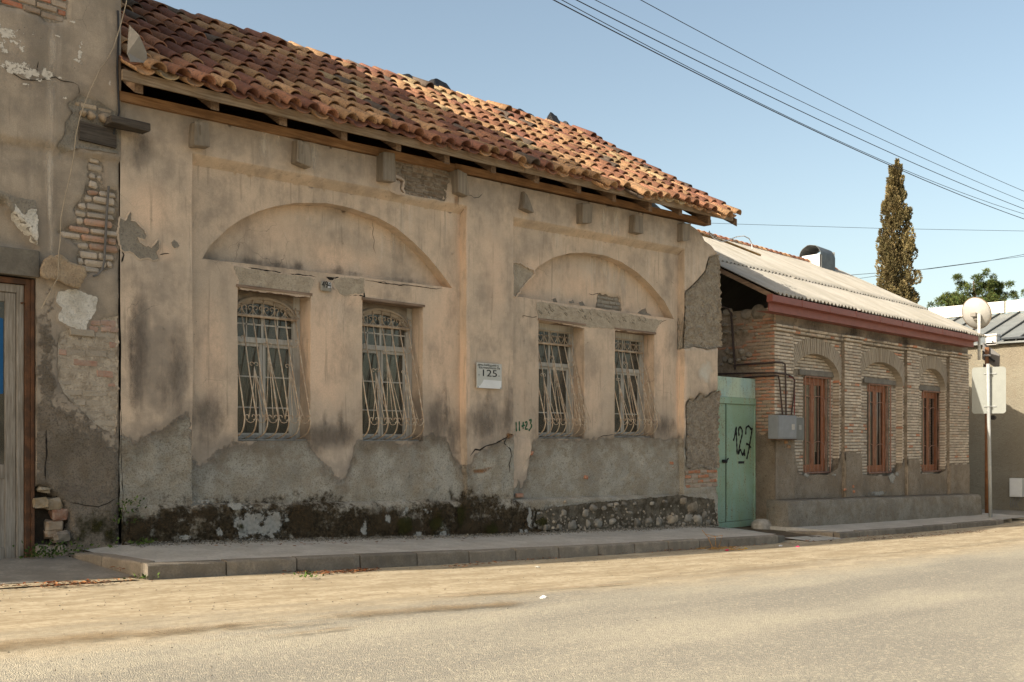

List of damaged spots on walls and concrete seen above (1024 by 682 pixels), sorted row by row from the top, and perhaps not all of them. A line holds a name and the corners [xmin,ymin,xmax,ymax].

peeling [0,24,62,85]
flaking render [0,191,39,246]
flaking render [40,95,180,289]
flaking render [388,161,450,201]
flaking render [683,254,723,349]
crack [470,434,513,471]
spalling [536,390,721,533]
water stain [286,501,316,536]
water stain [344,496,527,536]